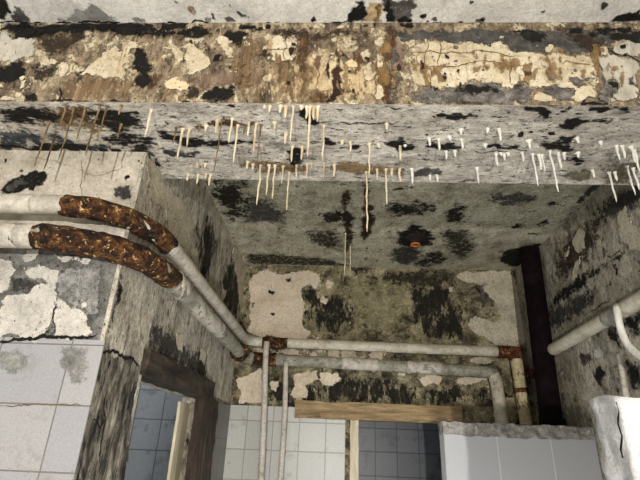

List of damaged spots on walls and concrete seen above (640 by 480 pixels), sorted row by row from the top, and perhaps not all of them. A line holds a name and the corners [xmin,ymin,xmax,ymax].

damp [0,76,258,167]
flaking render [78,36,250,107]
crack [416,40,525,87]
flaking render [402,36,640,166]
crack [0,301,96,344]
flaking render [0,249,101,344]
crack [103,349,139,366]
peeling [232,242,334,339]
damp [306,181,376,251]
damp [302,199,477,339]
damp [554,161,640,287]
crack [616,402,624,458]